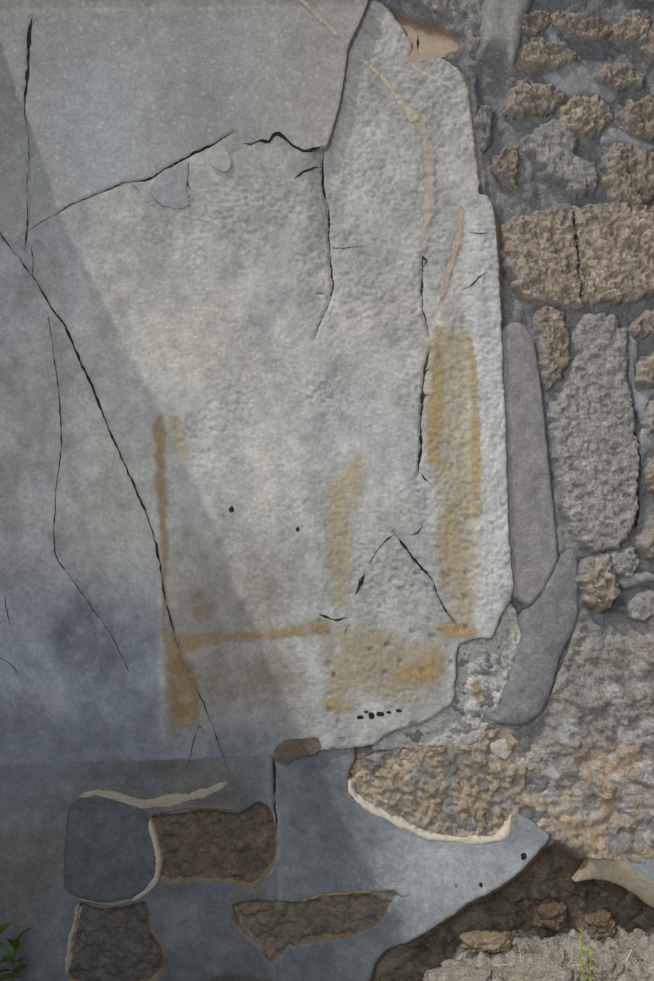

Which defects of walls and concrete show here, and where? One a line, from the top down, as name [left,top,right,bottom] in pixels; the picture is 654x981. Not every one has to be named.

spalling [385,5,459,66]
crack [358,57,489,485]
crack [0,18,363,773]
water stain [469,344,481,517]
crack [355,523,457,627]
spalling [348,728,527,845]
spalling [154,802,277,883]
spalling [65,901,166,981]
spalling [235,890,396,959]